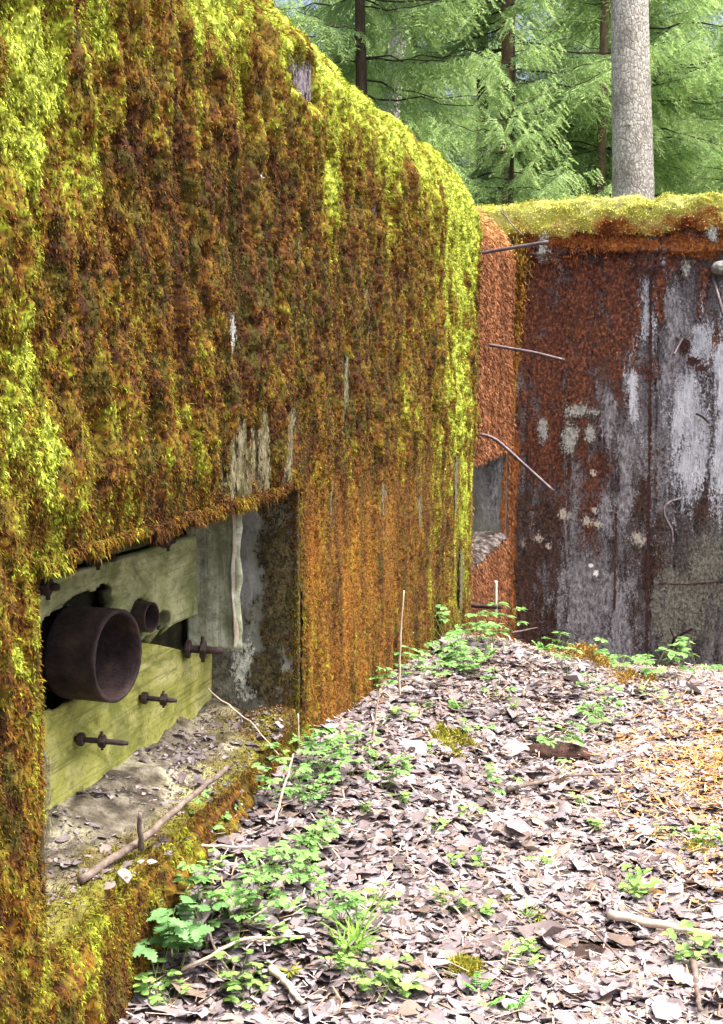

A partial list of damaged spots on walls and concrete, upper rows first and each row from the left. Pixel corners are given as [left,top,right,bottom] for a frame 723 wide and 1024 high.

water stain [485,246,723,667]
rust [498,231,723,661]